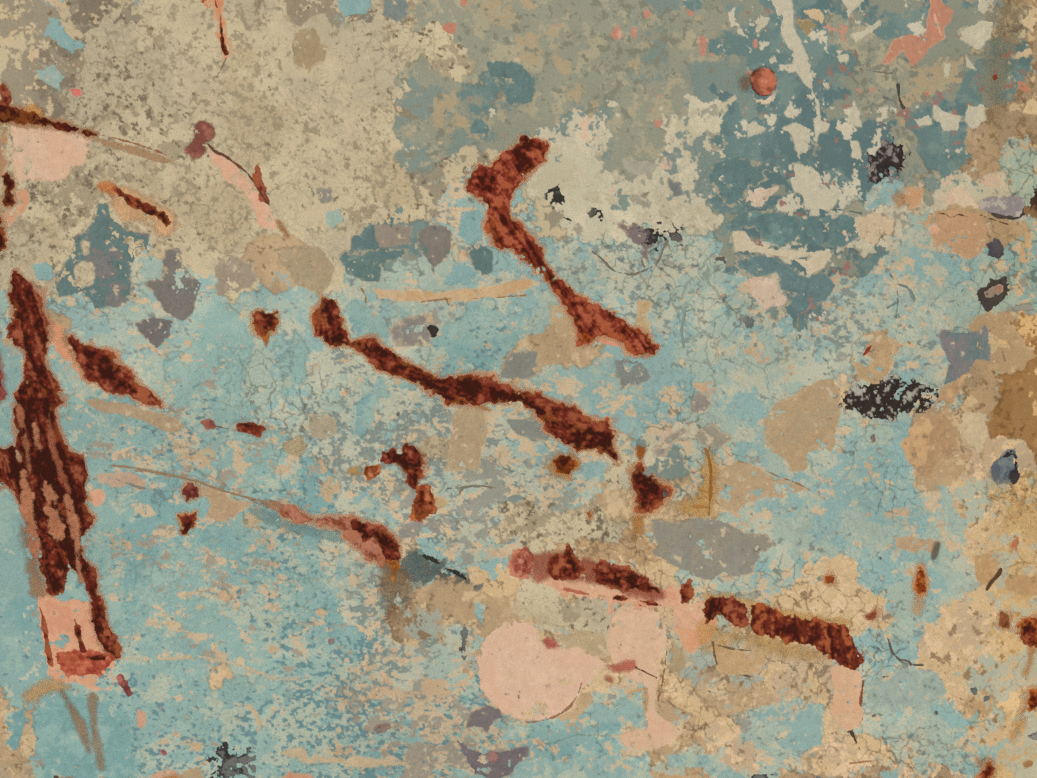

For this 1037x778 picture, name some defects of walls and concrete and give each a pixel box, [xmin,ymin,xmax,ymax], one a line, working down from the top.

peeling [882,0,994,71]
rust [0,82,167,156]
peeling [914,90,988,134]
rust [465,135,660,358]
peeling [706,120,1034,314]
rust [0,269,165,701]
rust [251,499,402,583]
rust [310,294,675,537]
peeling [899,323,1011,478]
peeling [989,448,1037,485]
rust [507,543,865,670]
peeling [3,685,146,778]